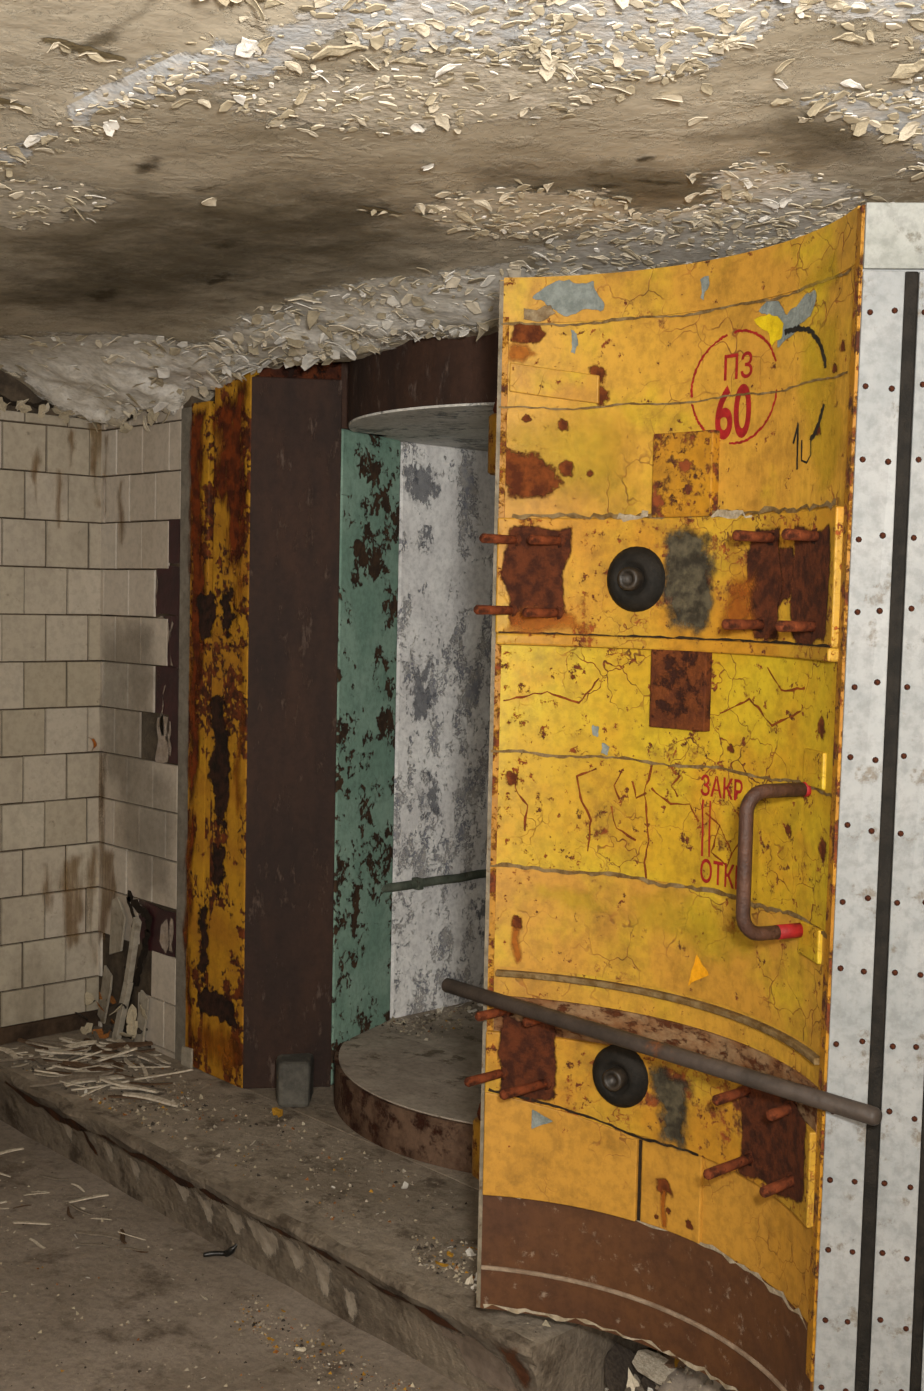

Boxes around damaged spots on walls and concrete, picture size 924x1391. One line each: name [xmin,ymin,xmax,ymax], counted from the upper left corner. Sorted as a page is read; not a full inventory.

peeling [0,0,924,231]
leakage [31,196,379,305]
peeling [0,152,887,433]
corrosion [505,447,593,499]
peeling [155,519,237,764]
corrosion [501,525,583,633]
corrosion [725,524,831,646]
corrosion [182,381,247,1048]
peeling [138,899,176,957]
corrosion [497,1015,557,1103]
corrosion [738,1086,806,1203]